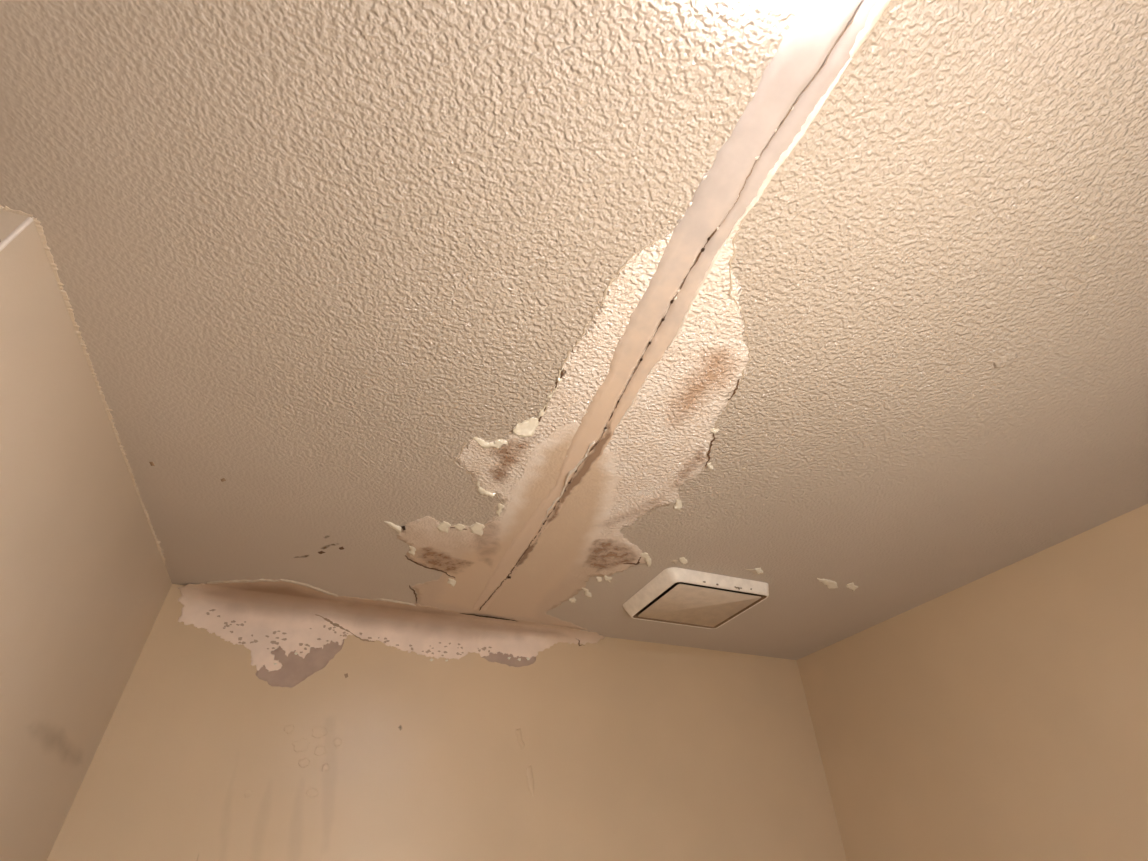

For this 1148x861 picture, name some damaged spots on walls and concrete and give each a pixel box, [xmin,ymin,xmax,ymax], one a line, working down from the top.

peeling [177,192,751,688]
crack [479,3,863,611]